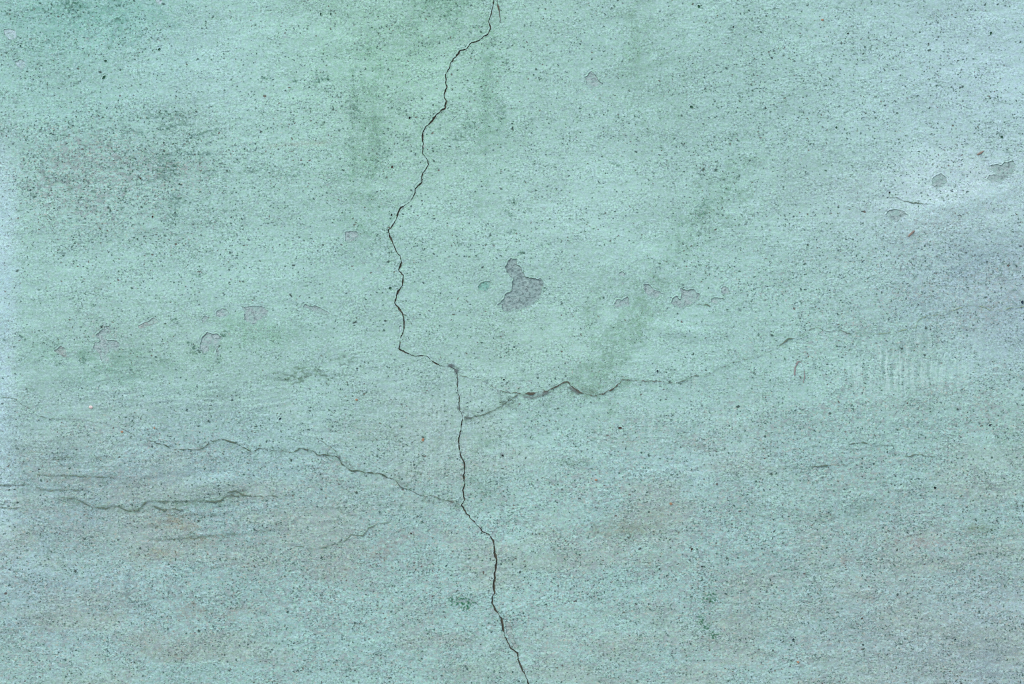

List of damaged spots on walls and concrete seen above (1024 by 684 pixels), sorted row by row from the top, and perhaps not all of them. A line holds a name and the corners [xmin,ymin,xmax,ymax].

crack [0,0,664,684]
peeling [496,257,545,314]